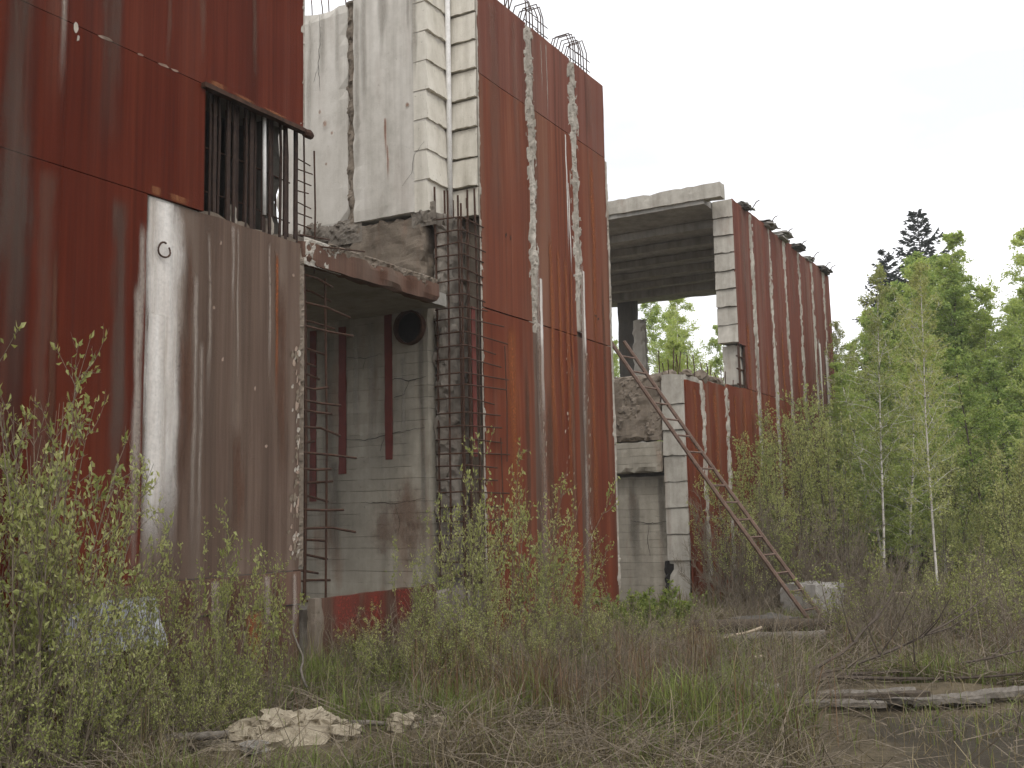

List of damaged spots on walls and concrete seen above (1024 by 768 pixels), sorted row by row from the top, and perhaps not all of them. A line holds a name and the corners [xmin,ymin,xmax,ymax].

leakage [133,197,182,514]
corrosion [179,269,193,446]
leakage [193,243,211,443]
spalling [287,0,438,603]
corrosion [548,244,575,518]